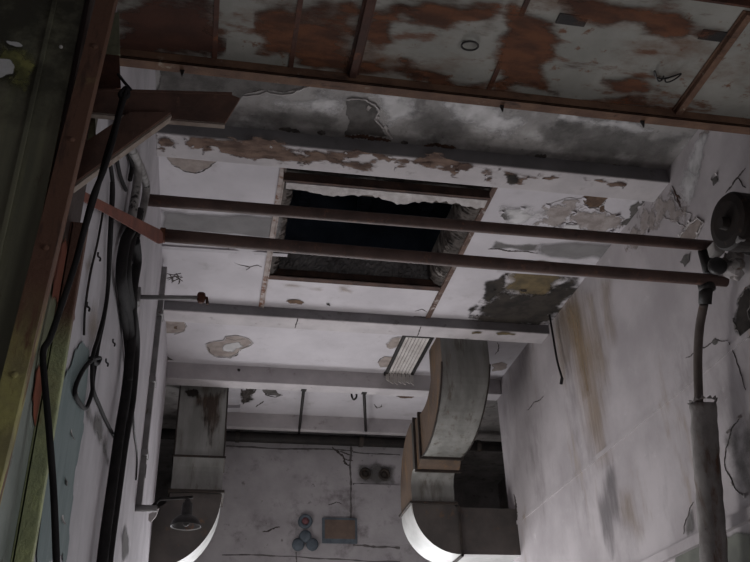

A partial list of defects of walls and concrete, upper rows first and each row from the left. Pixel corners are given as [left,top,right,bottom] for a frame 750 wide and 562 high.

rust [254,1,361,72]
rust [359,2,559,92]
rust [560,0,714,38]
damp [267,96,343,129]
damp [376,94,415,126]
damp [418,102,523,138]
damp [546,114,674,157]
rust [584,79,673,109]
peeling [156,136,473,178]
peeling [534,190,704,239]
spalling [733,286,750,339]
flaking render [205,335,254,358]